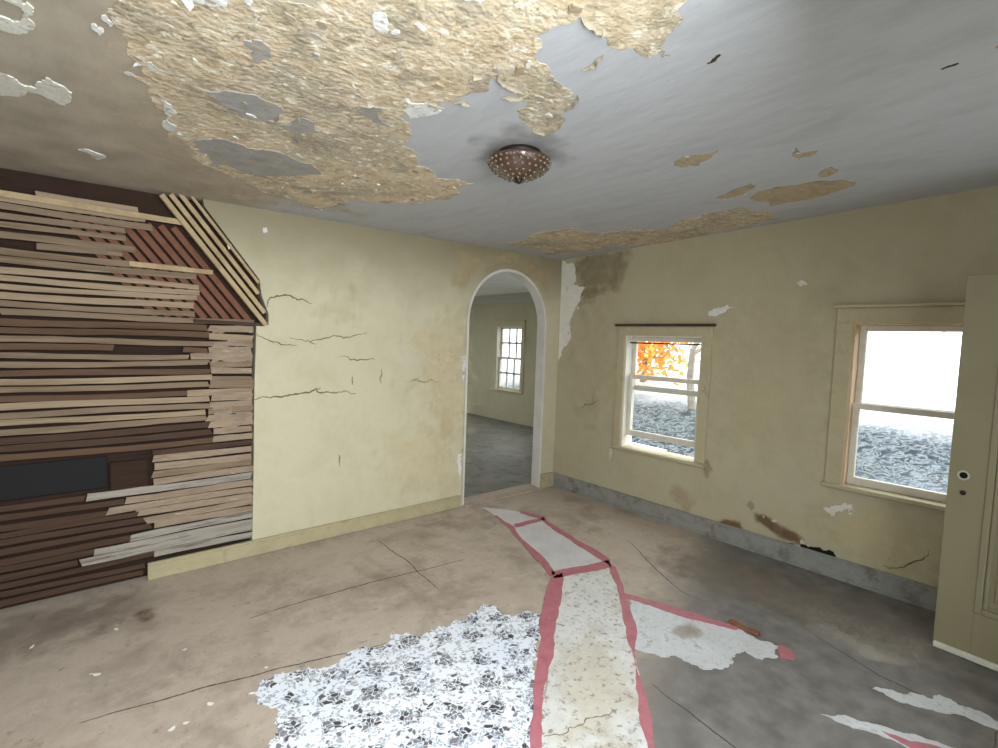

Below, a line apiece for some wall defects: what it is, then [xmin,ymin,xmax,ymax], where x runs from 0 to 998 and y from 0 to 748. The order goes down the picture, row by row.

peeling [0,0,35,35]
peeling [0,73,72,106]
flaking render [91,0,687,210]
peeling [78,148,106,160]
peeling [674,150,719,168]
flaking render [507,167,856,360]
crack [266,294,312,308]
crack [254,333,382,400]